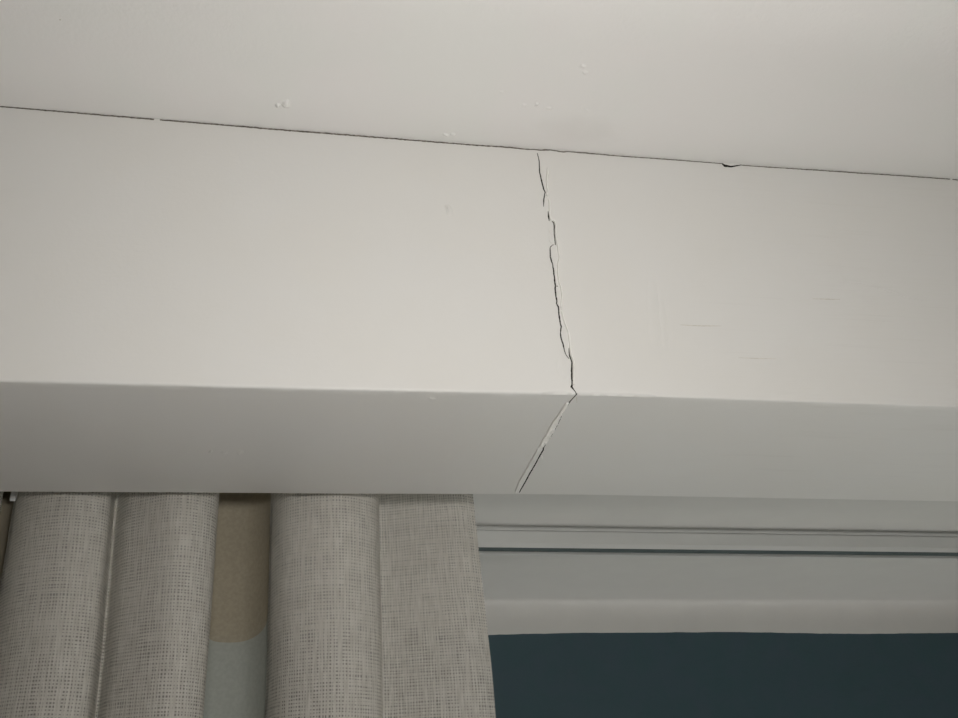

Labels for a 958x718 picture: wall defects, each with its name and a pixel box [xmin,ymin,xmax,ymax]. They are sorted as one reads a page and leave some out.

crack [0,106,957,493]